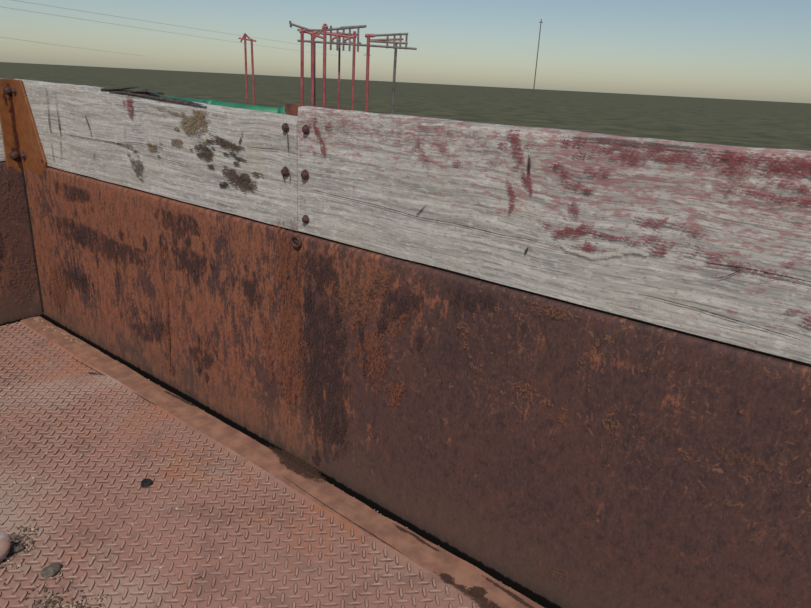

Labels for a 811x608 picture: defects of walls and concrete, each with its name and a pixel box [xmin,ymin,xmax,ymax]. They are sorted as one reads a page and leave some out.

peeling [741,175,811,205]
peeling [568,200,641,248]
crack [703,262,810,282]
corrosion [335,275,410,406]